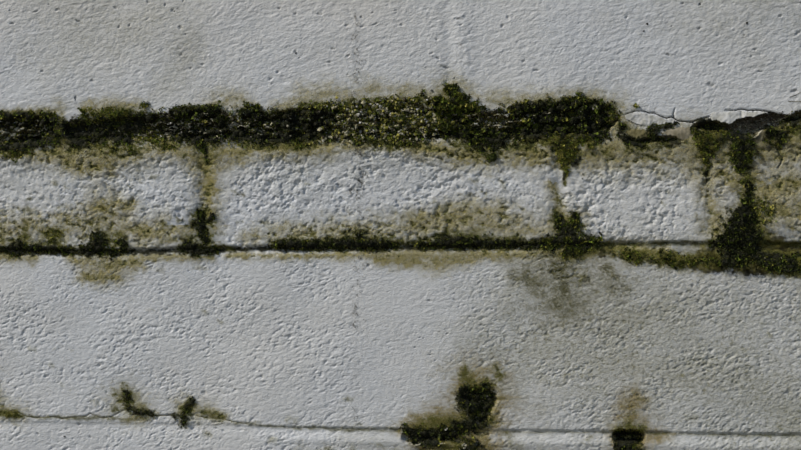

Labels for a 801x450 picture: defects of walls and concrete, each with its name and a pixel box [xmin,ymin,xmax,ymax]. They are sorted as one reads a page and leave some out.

damp [274,15,380,111]
crack [631,111,707,126]
damp [0,108,559,230]
damp [570,91,801,263]
damp [0,198,198,266]
damp [66,253,215,284]
damp [226,168,677,328]
damp [178,403,227,419]